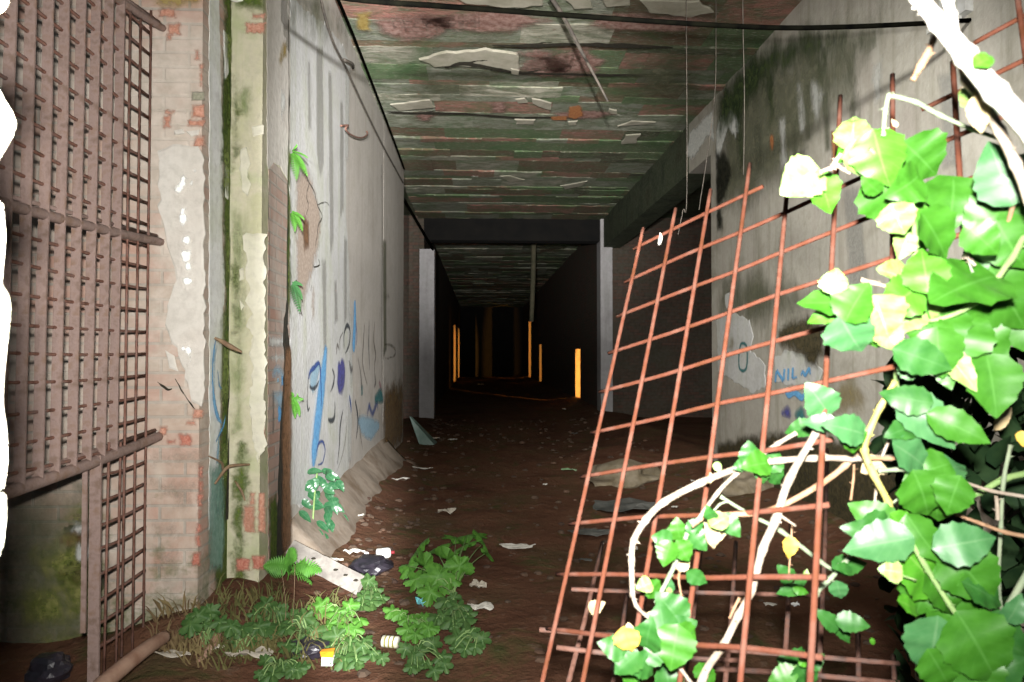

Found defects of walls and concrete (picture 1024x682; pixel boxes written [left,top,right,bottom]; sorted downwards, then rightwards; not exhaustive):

spalling [374,0,548,41]
peeling [566,0,714,31]
peeling [419,47,605,79]
leakage [225,75,246,128]
leakage [686,32,851,228]
spalling [921,60,973,178]
spalling [834,143,861,189]
peeling [157,0,229,565]
peeling [236,0,353,573]
leakage [722,280,798,319]
leakage [221,346,230,398]
spalling [539,162,900,682]